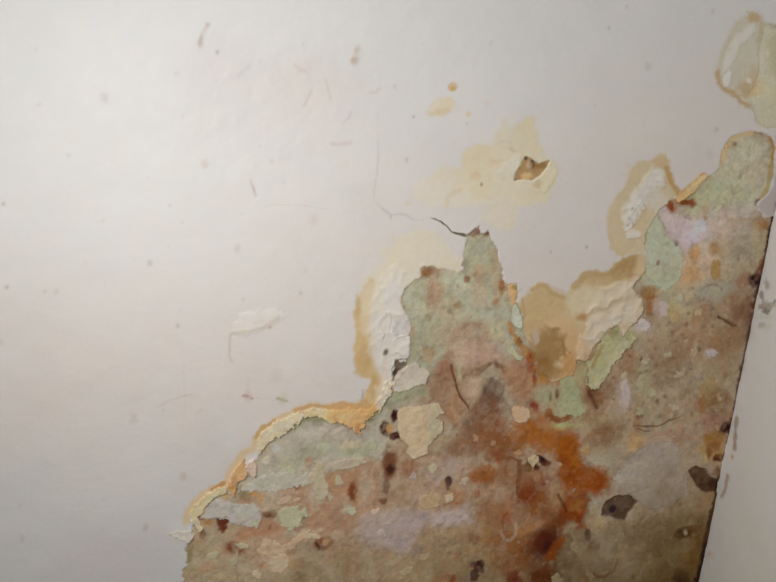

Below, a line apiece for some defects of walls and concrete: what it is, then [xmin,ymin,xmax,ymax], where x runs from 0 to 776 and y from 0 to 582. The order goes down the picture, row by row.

water stain [181,225,464,528]
crack [373,146,466,237]
peeling [168,131,775,582]
water stain [404,110,560,233]
water stain [516,151,714,383]
rust [525,425,615,582]